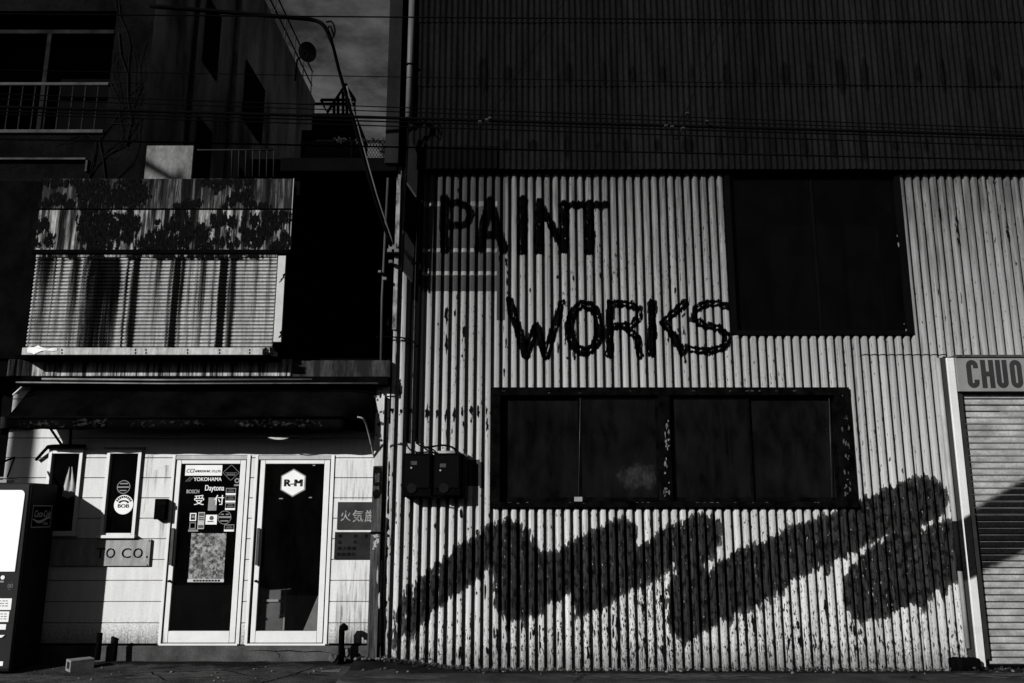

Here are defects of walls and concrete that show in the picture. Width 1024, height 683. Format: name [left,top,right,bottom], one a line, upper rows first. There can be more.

damp [27,179,280,348]
peeling [372,462,397,557]
peeling [438,585,839,659]
peeling [813,590,955,658]